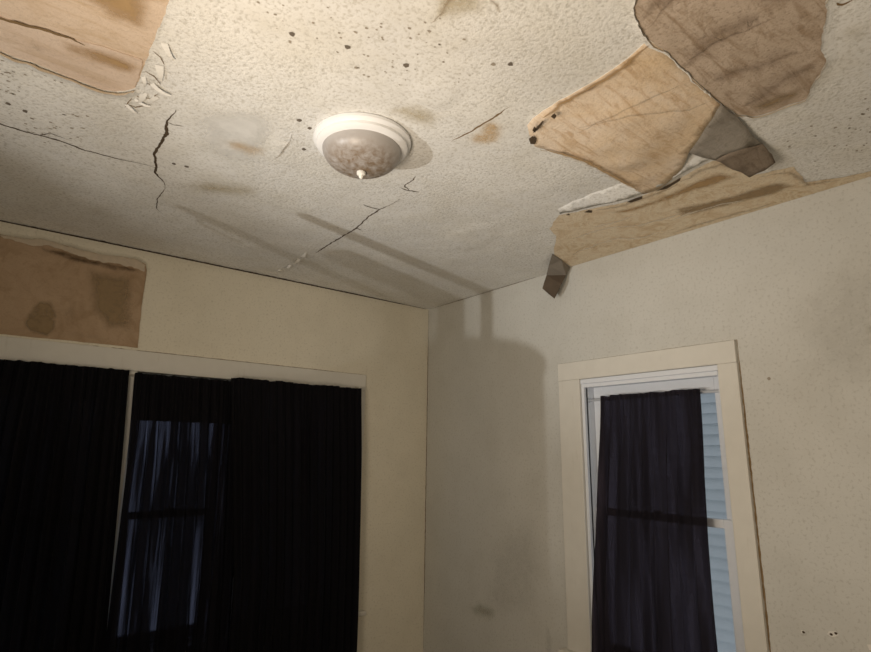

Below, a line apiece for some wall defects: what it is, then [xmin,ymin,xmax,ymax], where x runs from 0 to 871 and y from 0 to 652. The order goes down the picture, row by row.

peeling [0,0,194,114]
crack [0,110,180,211]
peeling [527,0,871,299]
crack [0,177,546,342]